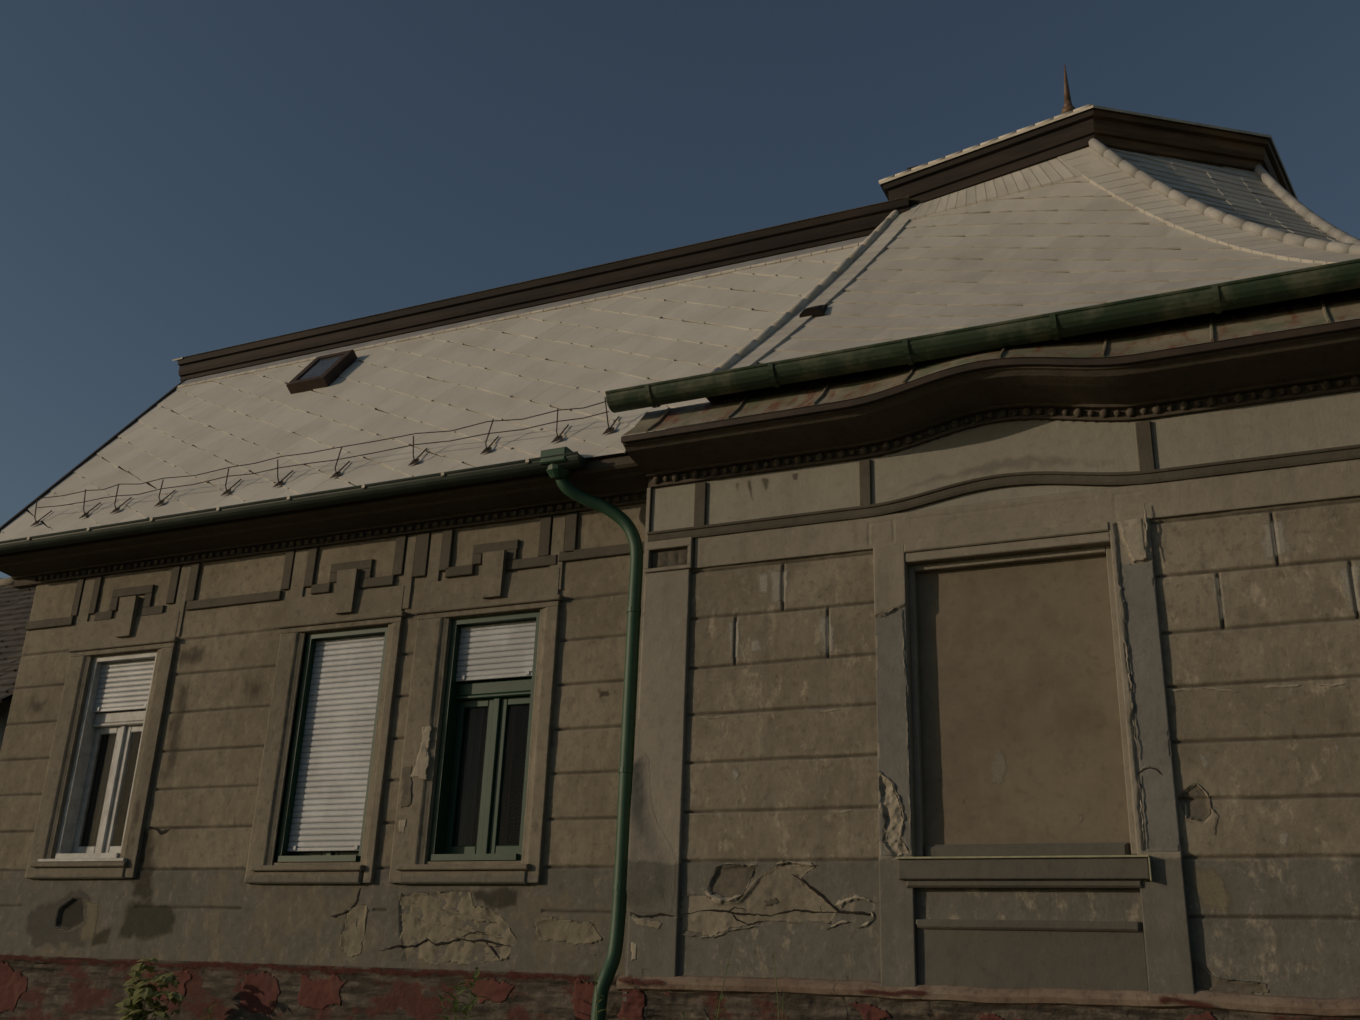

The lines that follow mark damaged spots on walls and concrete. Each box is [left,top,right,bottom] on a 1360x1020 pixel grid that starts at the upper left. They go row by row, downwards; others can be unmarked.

flaking render [1116,504,1217,852]
flaking render [398,726,433,833]
water stain [0,832,589,980]
flaking render [339,905,369,957]
crack [380,931,511,960]
flaking render [399,890,516,1004]
flaking render [680,861,874,938]